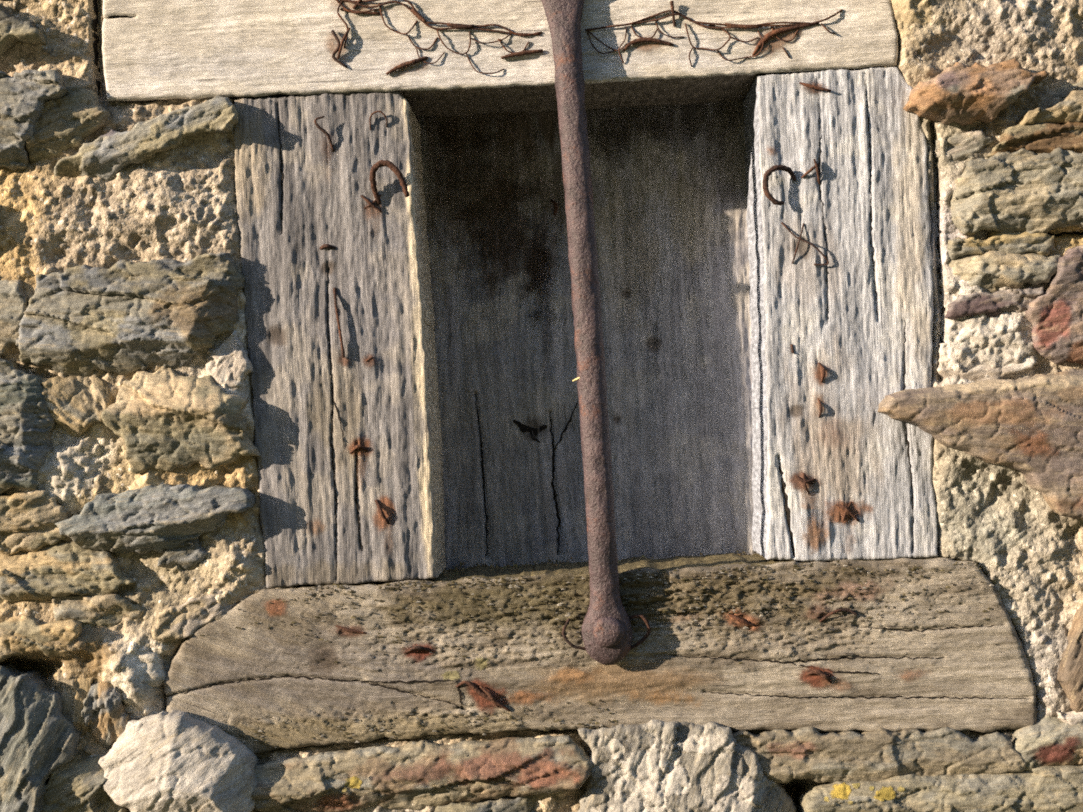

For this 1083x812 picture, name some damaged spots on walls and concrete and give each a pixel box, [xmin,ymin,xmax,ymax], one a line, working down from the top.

crack [93,0,135,95]
rust [755,29,799,51]
rust [815,365,828,411]
crack [327,269,362,581]
rust [349,439,369,455]
rust [375,497,394,528]
rust [790,472,871,548]
crack [167,675,466,710]
rust [405,645,434,661]
rust [468,668,683,711]
rust [800,667,849,689]
crack [671,624,1027,699]